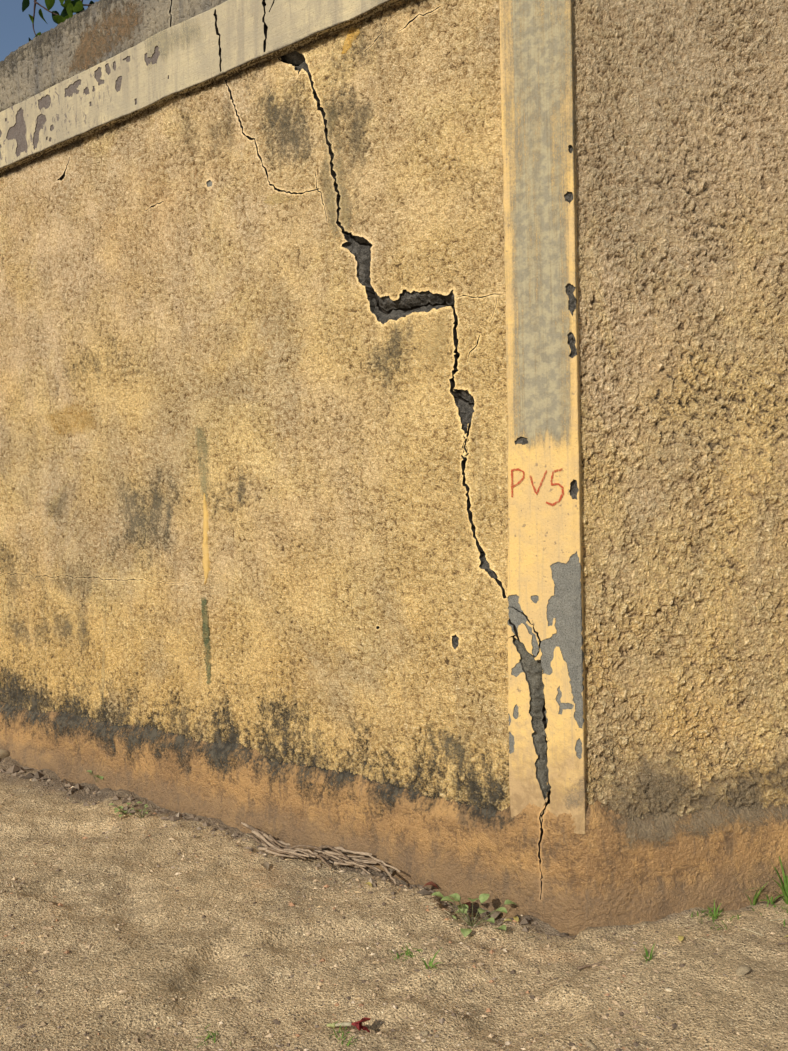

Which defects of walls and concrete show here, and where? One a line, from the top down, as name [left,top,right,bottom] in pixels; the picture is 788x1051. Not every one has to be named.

peeling [0,94,54,157]
peeling [65,56,130,106]
peeling [144,45,160,66]
crack [213,0,371,247]
crack [366,286,543,674]
damp [0,660,513,829]
crack [538,699,551,900]
peeling [507,551,584,800]